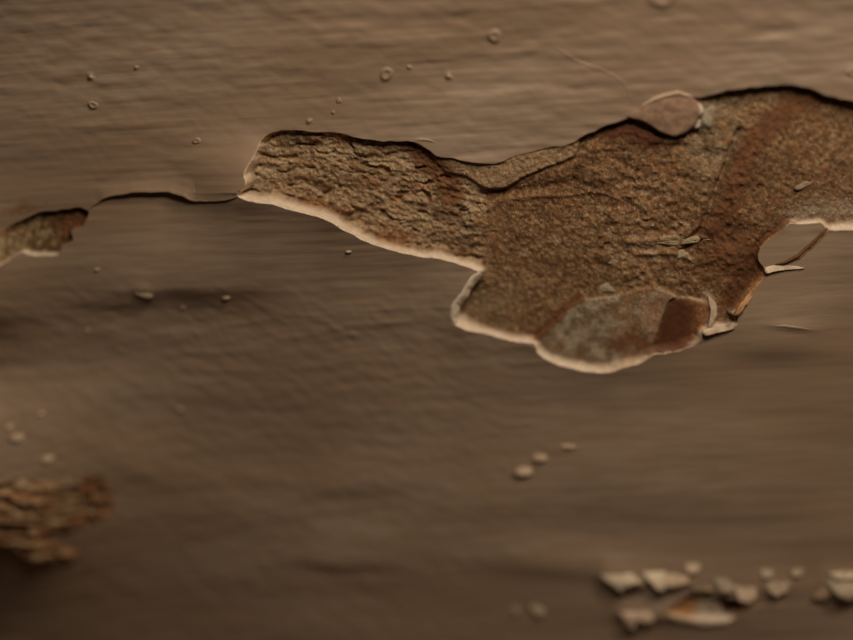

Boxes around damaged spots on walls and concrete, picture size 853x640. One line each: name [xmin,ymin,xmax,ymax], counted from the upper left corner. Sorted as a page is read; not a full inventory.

rust [704,88,821,236]
spalling [0,85,853,373]
rust [722,216,792,309]
peeling [0,472,115,563]
peeling [618,610,654,631]
peeling [601,563,757,626]
peeling [760,568,804,598]
peeling [813,571,853,602]